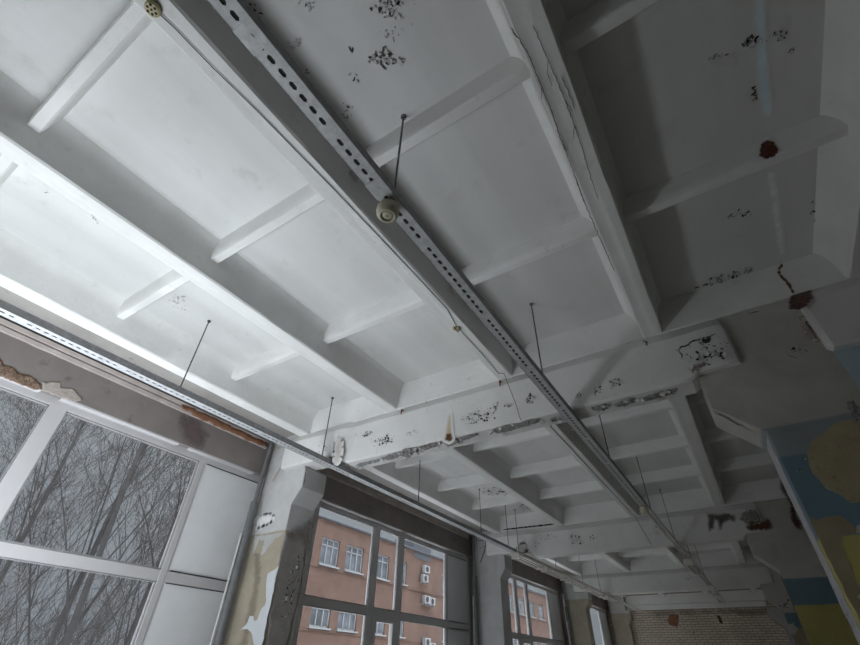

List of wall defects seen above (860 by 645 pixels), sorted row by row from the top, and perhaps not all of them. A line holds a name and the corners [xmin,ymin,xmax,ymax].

peeling [367,0,415,70]
crack [511,25,614,270]
corrosion [759,140,778,159]
corrosion [777,264,813,310]
flaking render [0,359,42,390]
spalling [591,378,678,413]
flaking render [182,405,268,449]
corrosion [442,412,455,445]
spalling [355,402,563,469]
corrosion [790,504,802,529]
flaking render [766,437,860,645]
peeling [240,533,308,645]